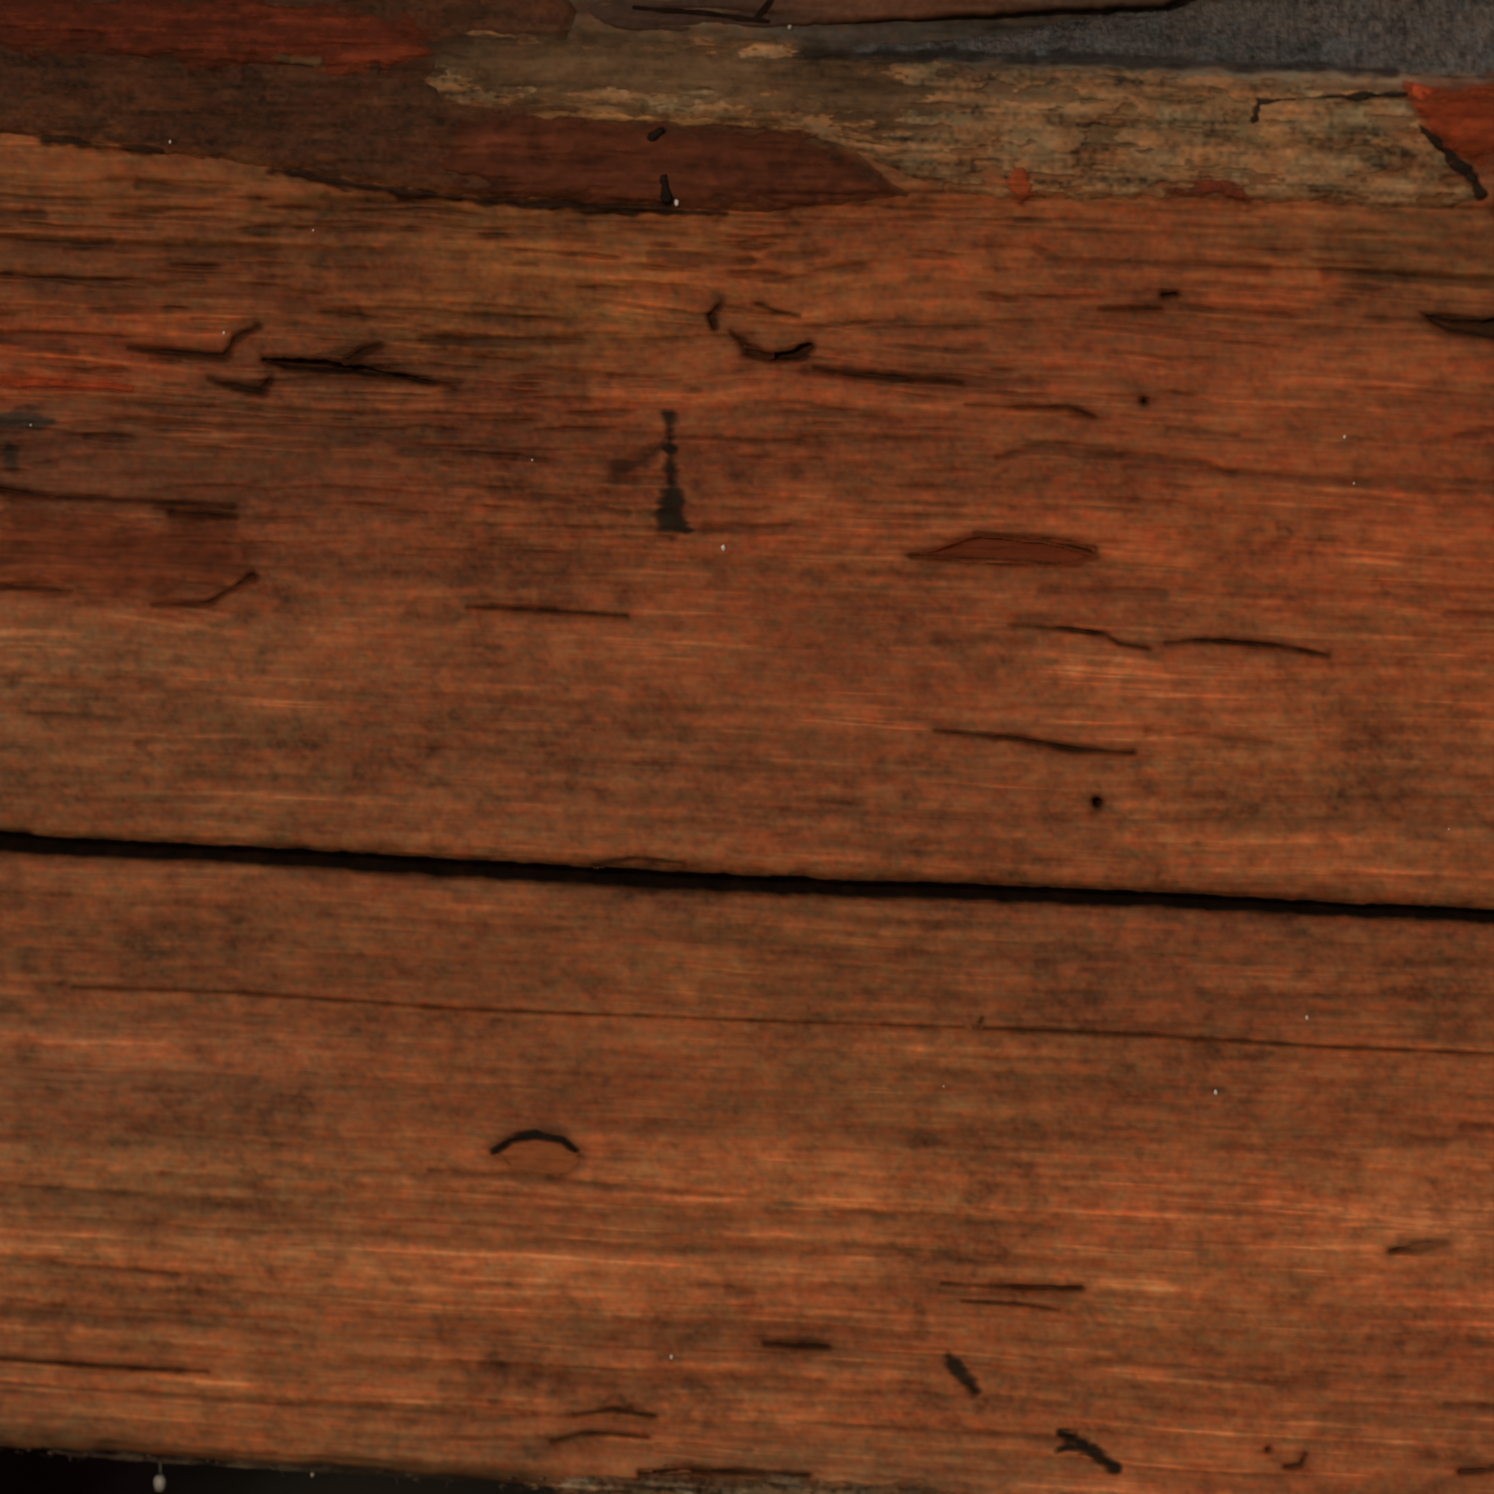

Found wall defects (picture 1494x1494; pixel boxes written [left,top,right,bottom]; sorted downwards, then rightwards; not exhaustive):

peeling [0,0,1487,215]
crack [0,827,1494,927]